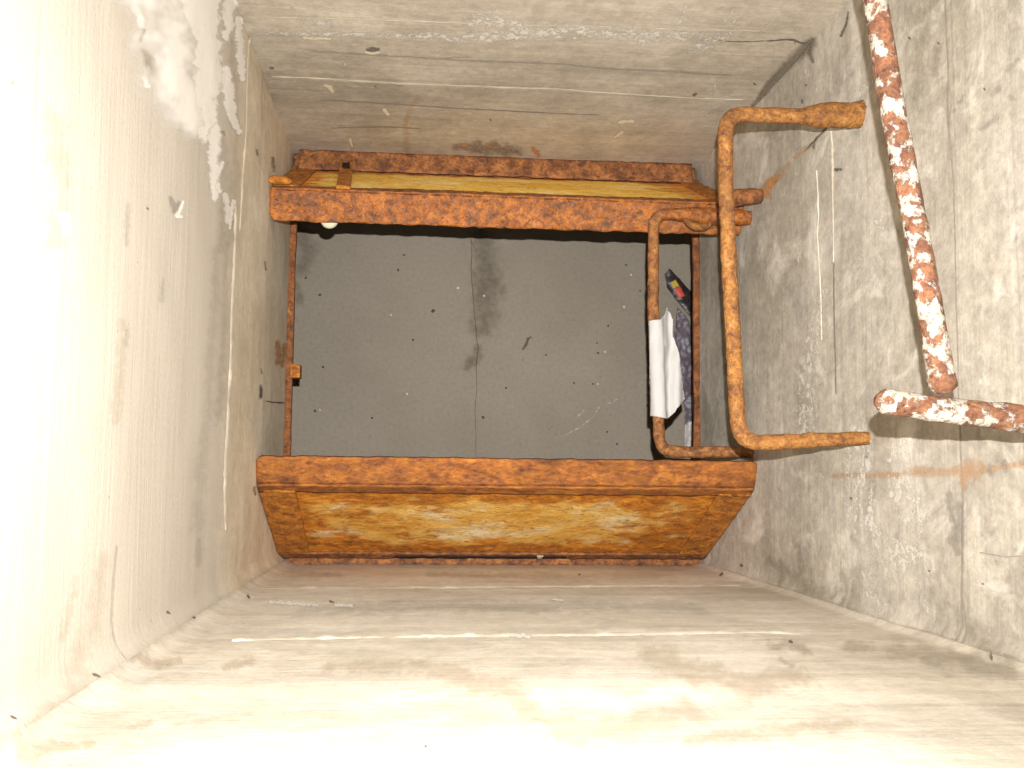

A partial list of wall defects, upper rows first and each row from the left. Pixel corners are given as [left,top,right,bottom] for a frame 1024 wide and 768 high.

peeling [122,0,247,230]
crack [470,237,479,449]